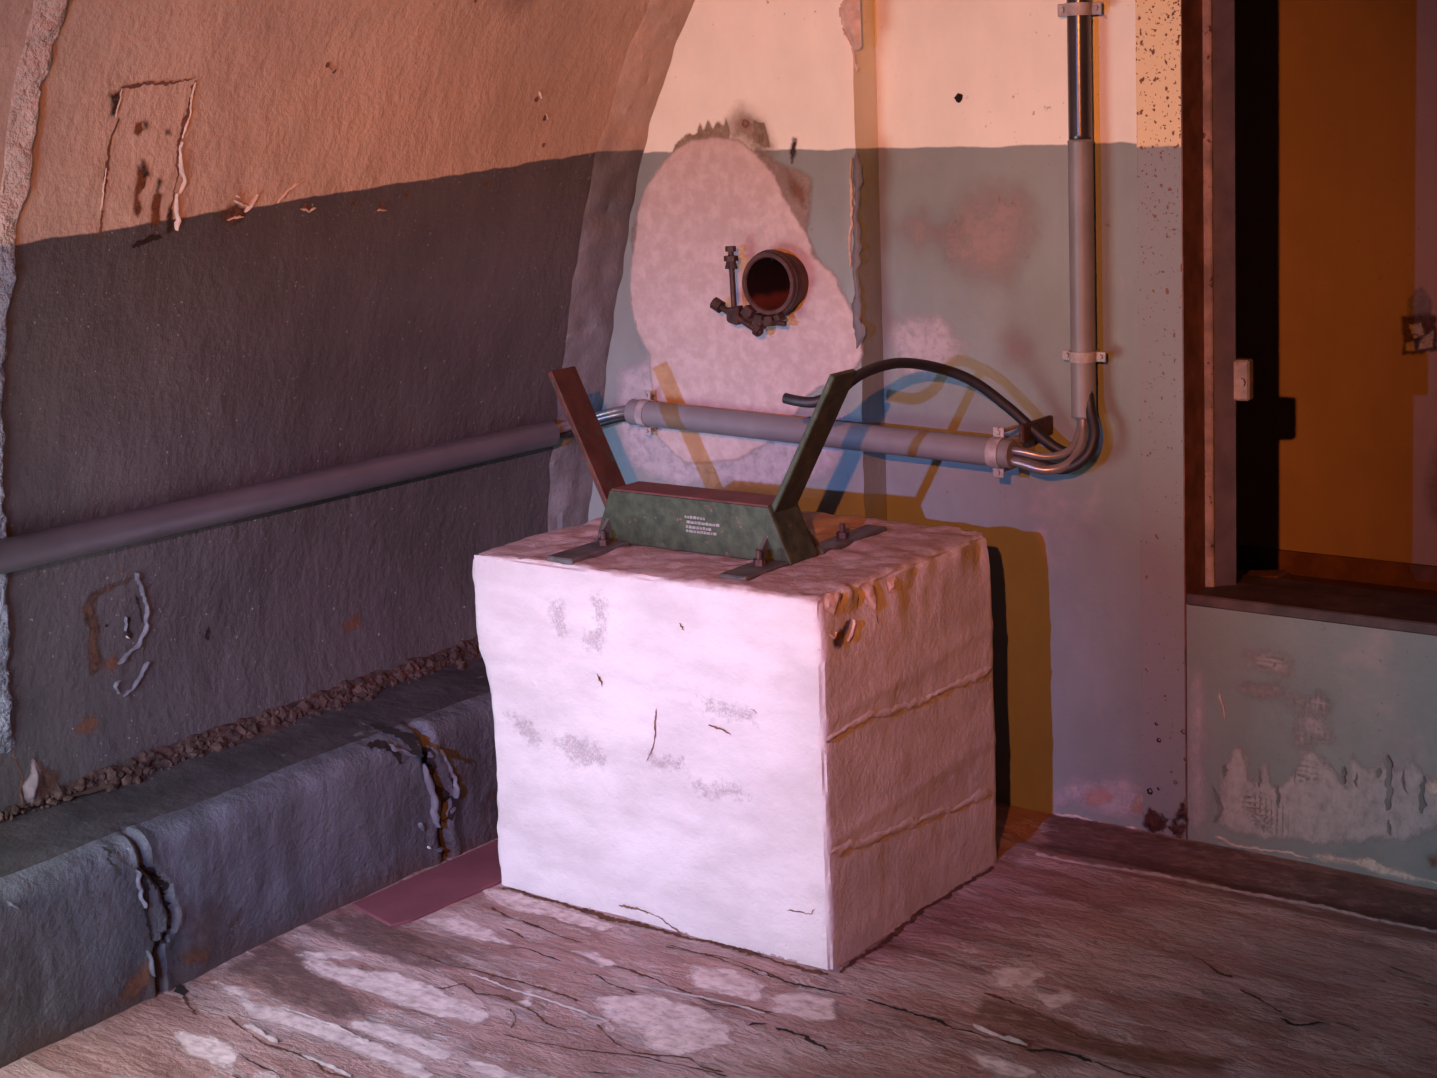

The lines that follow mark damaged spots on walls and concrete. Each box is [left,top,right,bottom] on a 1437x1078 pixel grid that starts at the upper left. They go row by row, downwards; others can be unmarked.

spalling [848,152,866,349]
spalling [82,568,151,697]
crack [367,723,460,852]
peeling [1045,818,1437,929]
crack [102,847,369,1078]
crack [409,905,1146,1078]